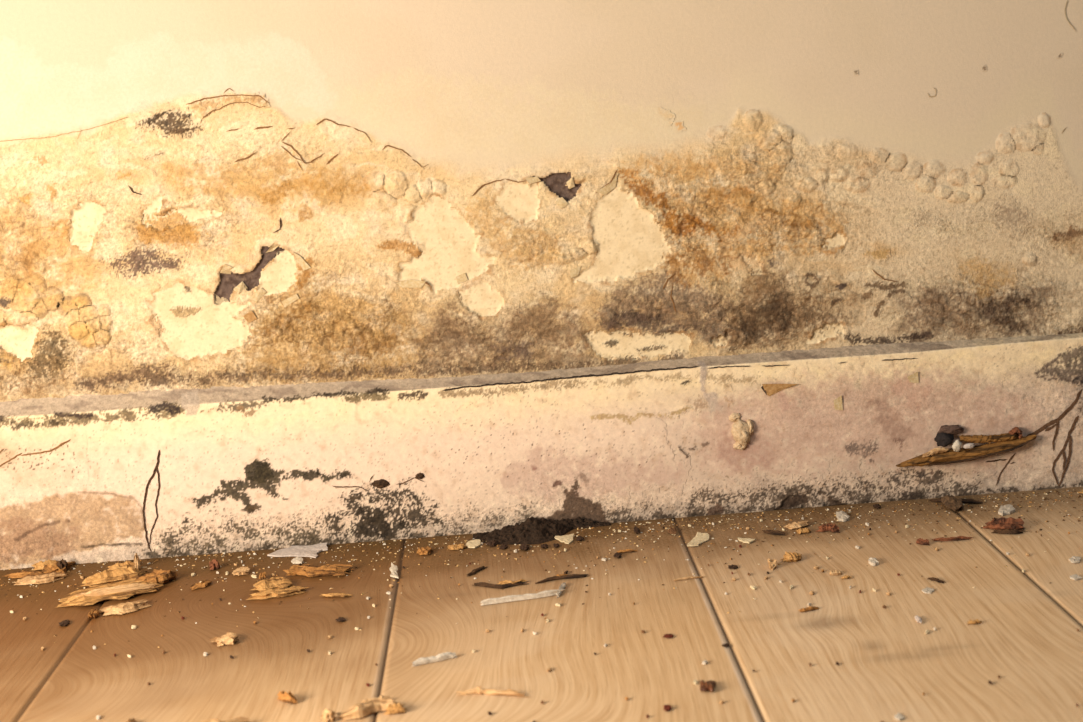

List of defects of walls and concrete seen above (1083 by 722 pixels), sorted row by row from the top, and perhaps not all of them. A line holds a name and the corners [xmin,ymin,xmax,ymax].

crack [186,88,428,169]
water stain [0,29,732,223]
flaking render [152,245,311,360]
flaking render [397,195,505,316]
flaking render [496,172,582,224]
flaking render [570,173,672,283]
water stain [0,180,1083,570]
crack [0,440,70,467]
crack [142,450,160,551]
peeling [952,440,975,452]
crack [986,389,1082,486]